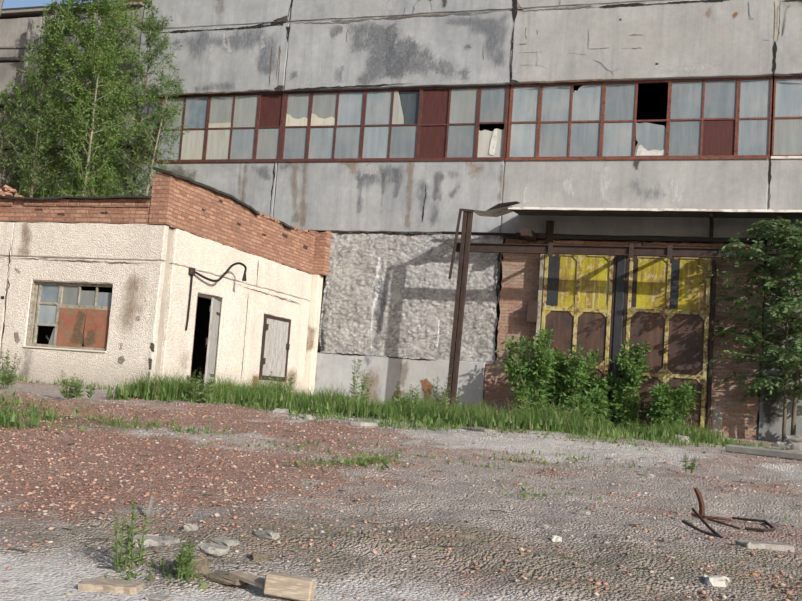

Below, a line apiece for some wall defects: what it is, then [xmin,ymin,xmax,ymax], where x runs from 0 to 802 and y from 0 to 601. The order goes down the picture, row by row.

damp [190,30,274,73]
crack [269,46,281,85]
crack [161,0,724,79]
crack [766,1,781,75]
damp [357,164,401,197]
damp [421,173,443,222]
crack [766,160,774,207]
damp [125,280,138,320]
corrosion [420,379,433,401]